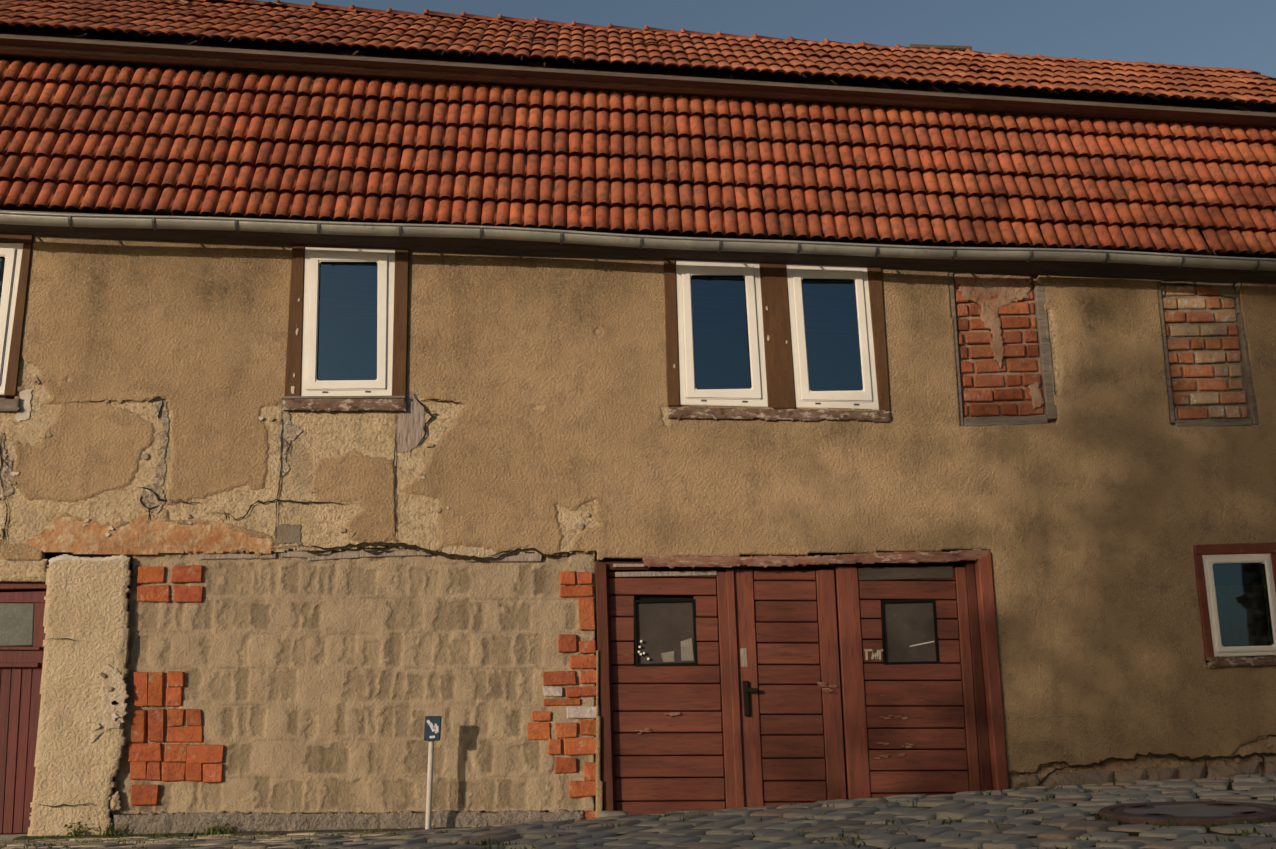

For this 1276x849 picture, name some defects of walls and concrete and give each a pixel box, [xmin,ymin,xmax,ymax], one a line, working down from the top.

flaking render [49,554,204,603]
peeling [0,358,539,561]
crack [140,393,595,561]
peeling [555,499,600,553]
flaking render [90,663,225,812]
flaking render [527,571,601,819]
crack [1010,735,1276,786]